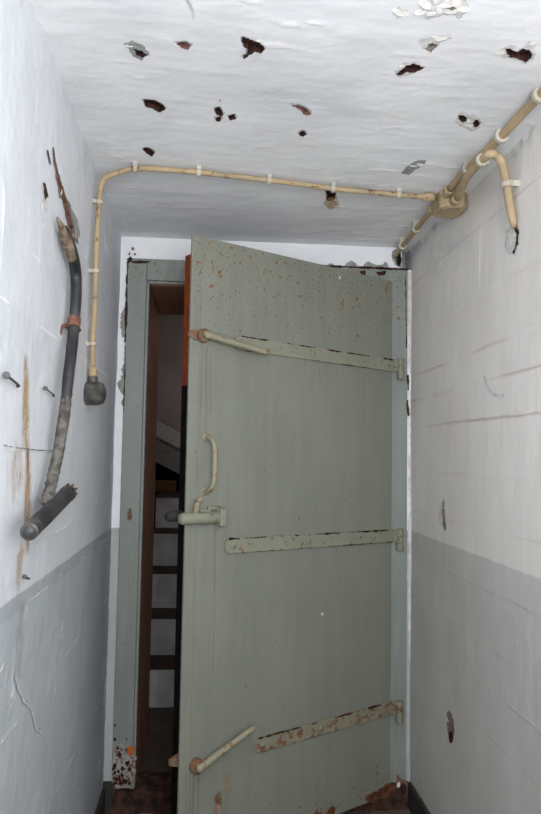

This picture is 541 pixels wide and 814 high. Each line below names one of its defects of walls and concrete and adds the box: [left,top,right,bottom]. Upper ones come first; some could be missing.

peeling [392,0,470,20]
spalling [124,40,149,61]
spalling [241,37,264,59]
peeling [418,33,452,53]
spalling [495,41,537,64]
spalling [395,61,425,78]
rust [112,738,137,789]
rust [365,775,408,803]